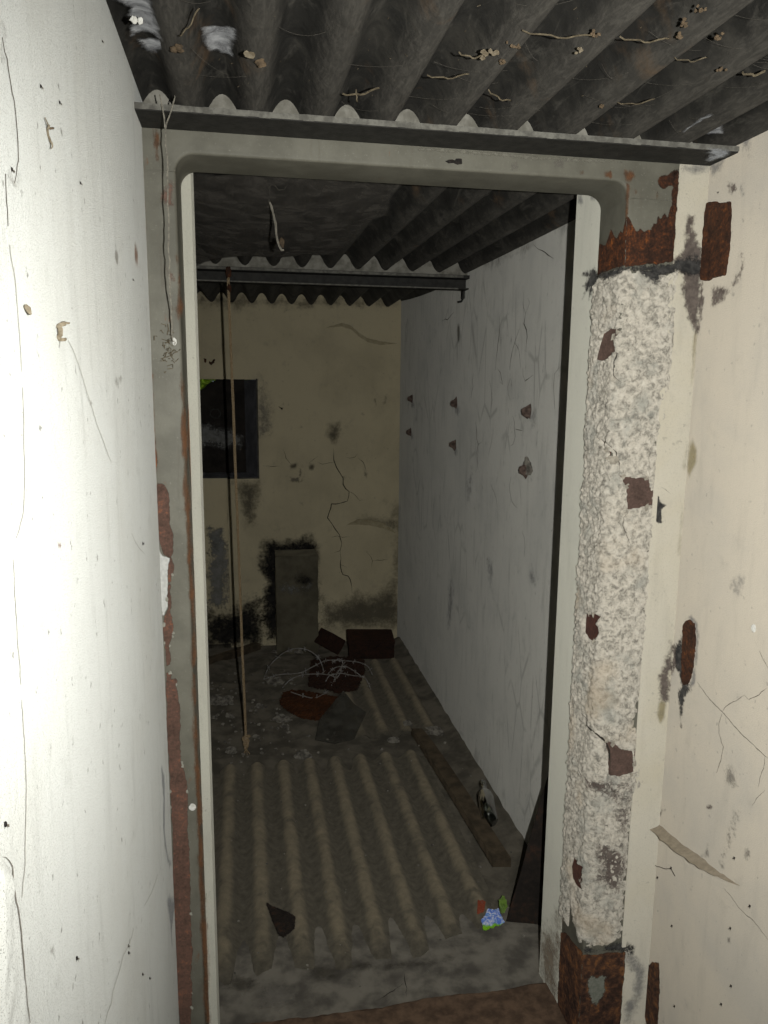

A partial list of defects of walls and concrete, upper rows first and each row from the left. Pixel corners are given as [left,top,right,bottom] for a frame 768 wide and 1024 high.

corrosion [597,169,679,275]
spalling [592,328,621,362]
corrosion [181,408,195,611]
crack [271,449,366,587]
spalling [601,441,653,512]
spalling [585,612,600,644]
spalling [604,737,636,778]
crack [697,682,766,804]
corrosion [194,720,210,1022]
spalling [568,858,583,891]
corrosion [557,932,626,1024]